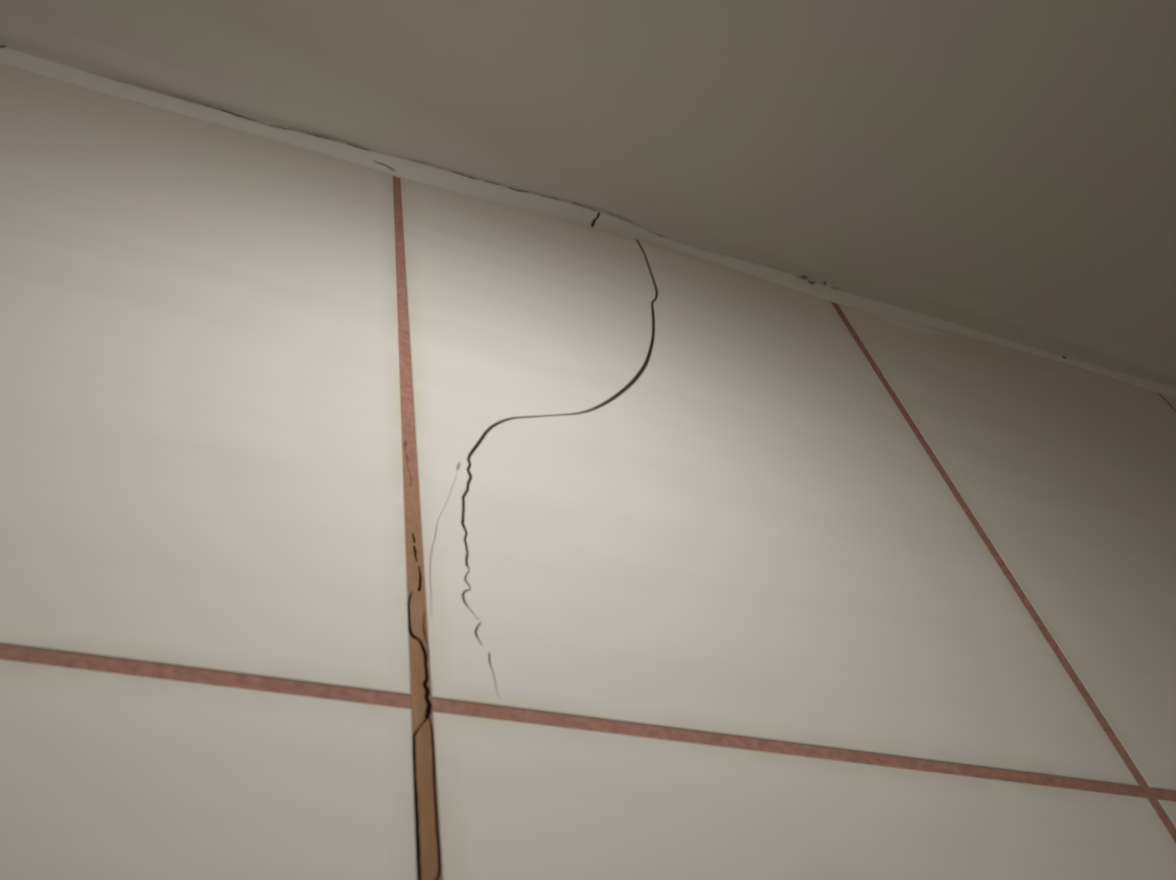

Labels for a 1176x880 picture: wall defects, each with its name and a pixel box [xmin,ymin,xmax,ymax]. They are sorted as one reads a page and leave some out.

crack [571,269,658,414]
crack [461,416,529,684]
crack [407,533,441,880]